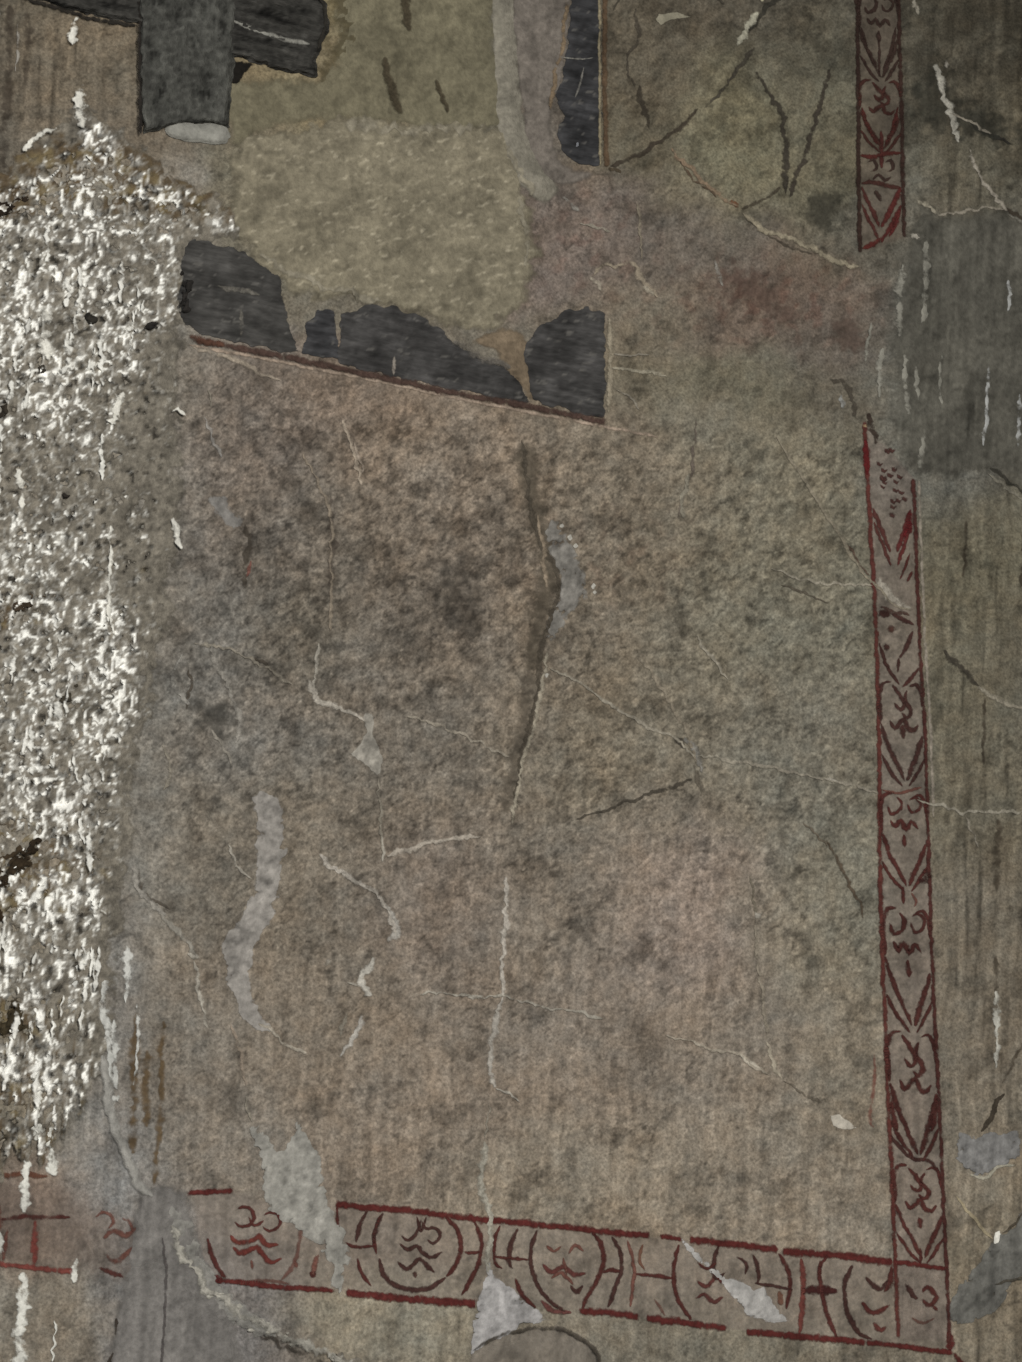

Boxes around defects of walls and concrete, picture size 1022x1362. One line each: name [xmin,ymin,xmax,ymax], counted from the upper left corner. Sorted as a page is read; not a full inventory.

water stain [68,17,78,44]
crack [609,0,858,269]
crack [911,63,1022,239]
water stain [982,368,990,445]
water stain [0,91,240,1212]
crack [408,441,877,824]
crack [132,791,306,1121]
crack [320,779,479,1056]
water stain [13,1272,32,1362]
flaking render [169,1206,361,1362]
flaking render [250,1122,351,1293]
flaking render [471,1263,544,1354]